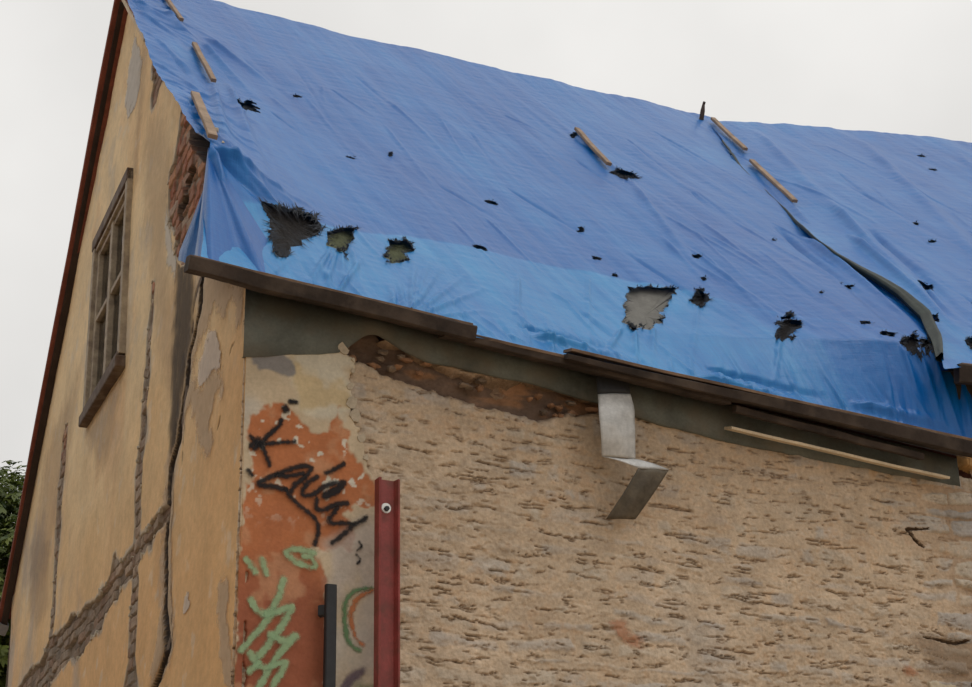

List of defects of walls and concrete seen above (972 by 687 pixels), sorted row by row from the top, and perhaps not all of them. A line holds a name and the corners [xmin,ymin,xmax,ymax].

peeling [125,34,163,119]
flaking render [167,109,210,265]
crack [180,385,188,430]
peeling [183,277,243,457]
flaking render [23,280,171,687]
peeling [216,335,599,687]
flaking render [957,455,972,474]
crack [157,622,172,687]
crack [923,636,970,646]